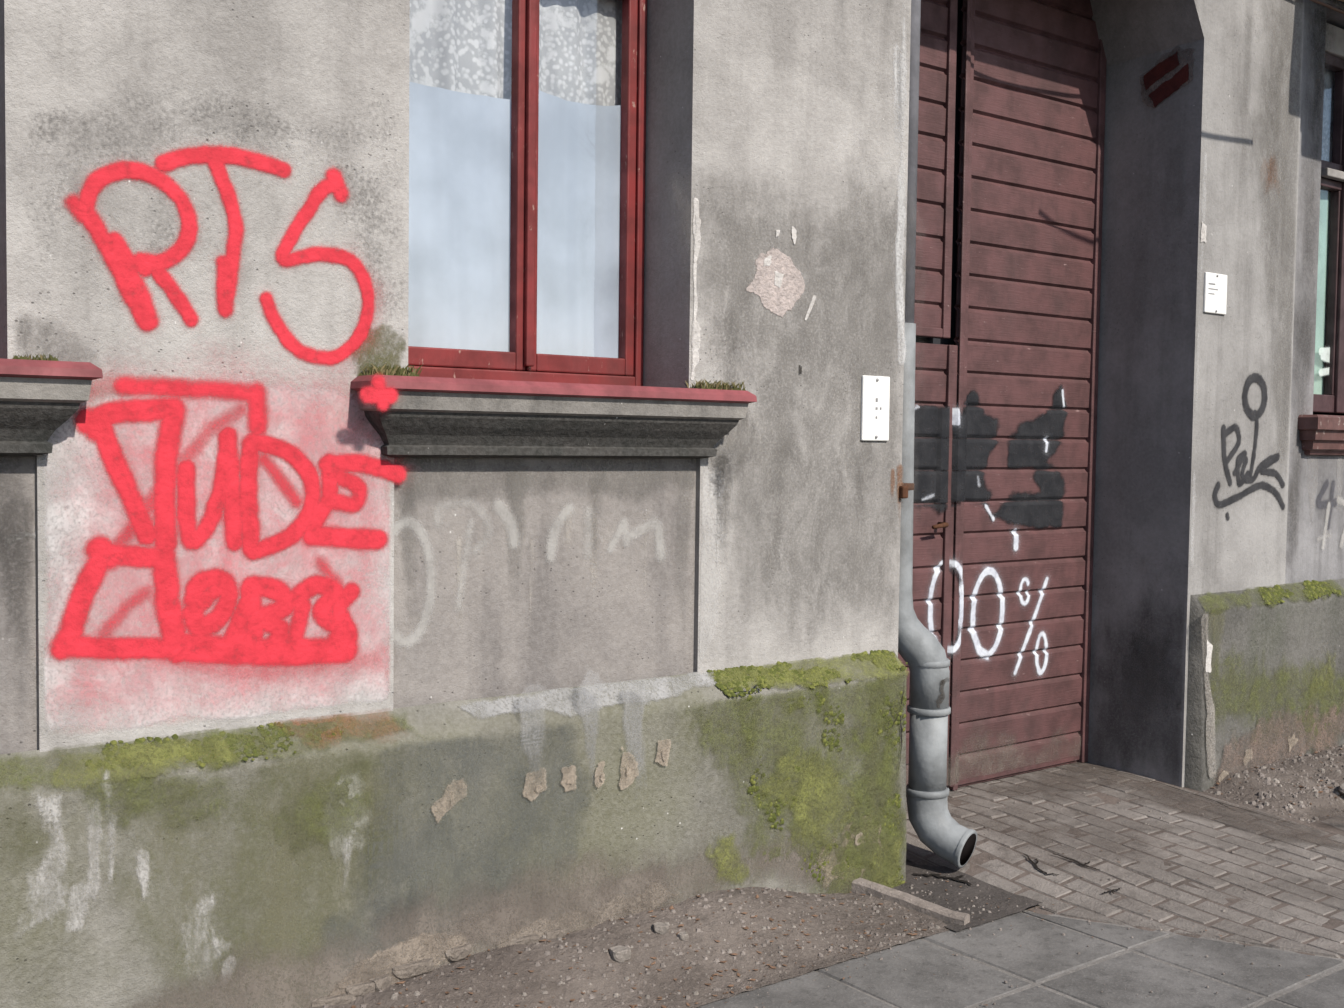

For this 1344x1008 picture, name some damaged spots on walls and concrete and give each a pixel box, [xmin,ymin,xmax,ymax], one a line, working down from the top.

spalling [746,226,805,317]
spalling [431,779,464,823]
spalling [523,765,577,801]
spalling [595,747,639,790]
spalling [655,739,671,766]